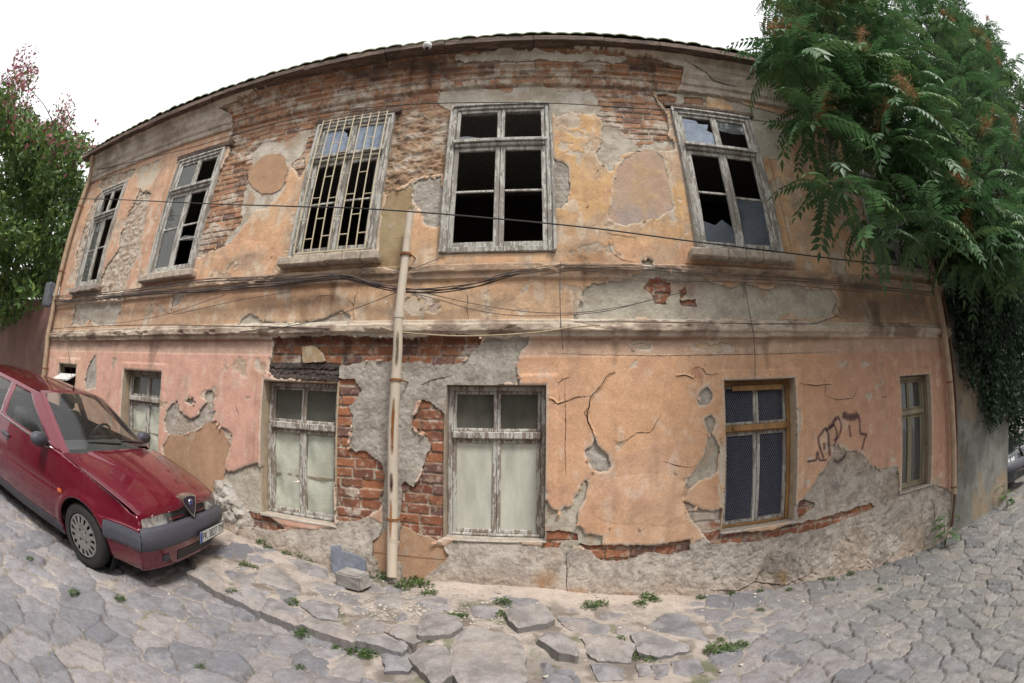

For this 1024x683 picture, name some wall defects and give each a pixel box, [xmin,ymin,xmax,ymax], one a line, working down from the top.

spalling [72,158,163,326]
spalling [198,48,792,270]
spalling [574,257,837,321]
peeling [162,390,285,530]
spalling [238,311,530,580]
crack [549,349,820,469]
spalling [541,387,951,561]